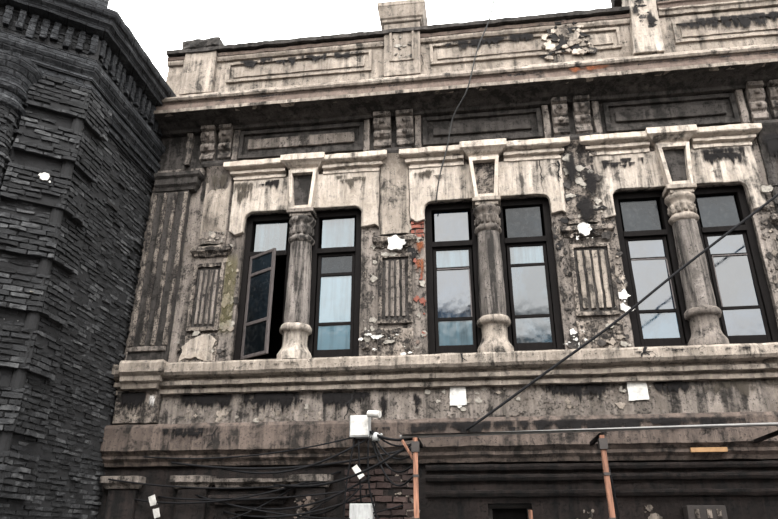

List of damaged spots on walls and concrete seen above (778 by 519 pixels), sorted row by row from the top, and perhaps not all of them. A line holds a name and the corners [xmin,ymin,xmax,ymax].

damp [632,0,655,24]
spalling [635,0,663,28]
spalling [541,18,597,60]
damp [241,51,358,68]
peeling [759,183,778,287]
spalling [551,151,635,349]
peeling [176,258,239,362]
peeling [358,317,428,355]
damp [182,394,231,410]
damp [243,392,302,411]
damp [317,392,370,410]
damp [162,428,208,438]